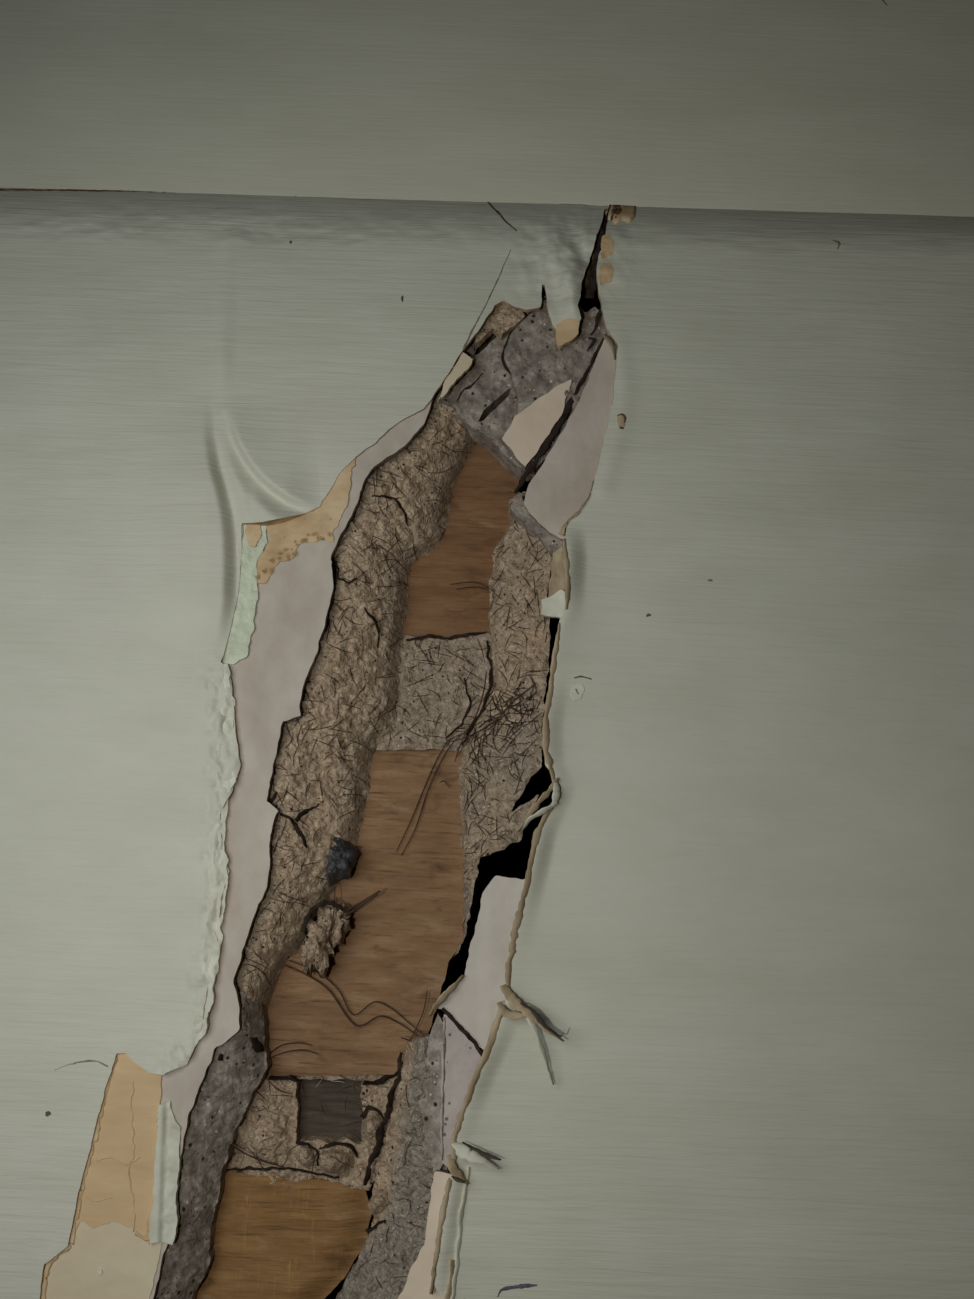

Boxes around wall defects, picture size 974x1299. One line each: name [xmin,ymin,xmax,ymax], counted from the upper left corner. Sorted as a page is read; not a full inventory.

flaking render [41,295,626,1299]
crack [514,204,636,494]